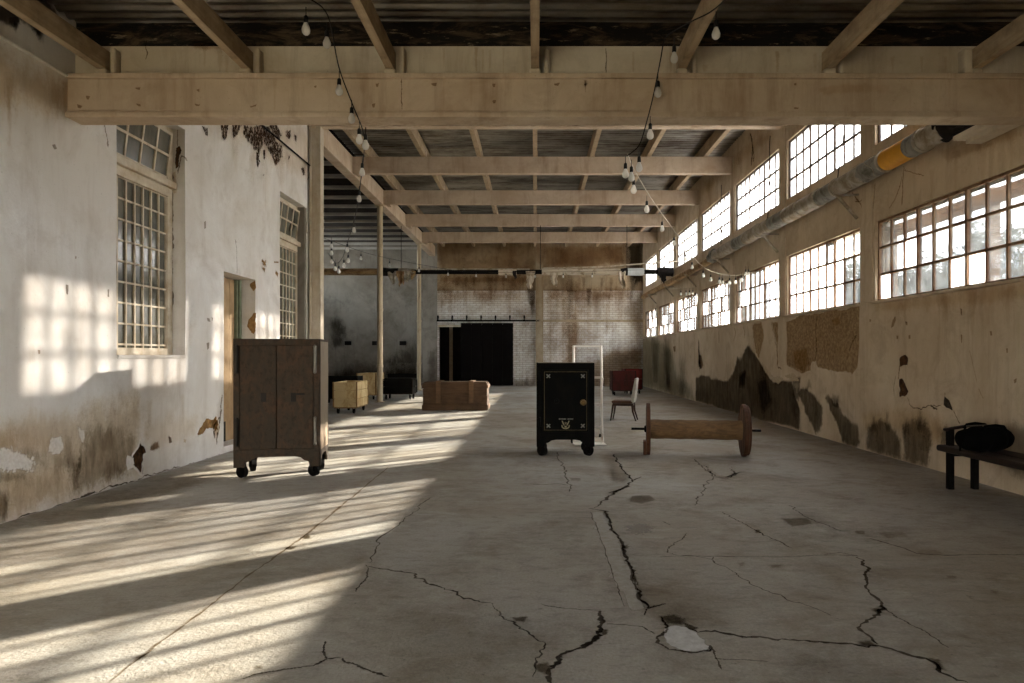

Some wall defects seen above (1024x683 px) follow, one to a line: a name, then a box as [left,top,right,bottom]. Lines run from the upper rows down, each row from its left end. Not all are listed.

peeling [221,125,297,167]
flaking render [752,303,871,384]
flaking render [894,354,909,400]
peeling [0,446,36,473]
peeling [48,436,64,455]
flaking render [126,437,172,476]
flaking render [195,413,220,439]
leakage [696,346,931,465]
crack [356,452,968,683]
crack [243,641,389,679]